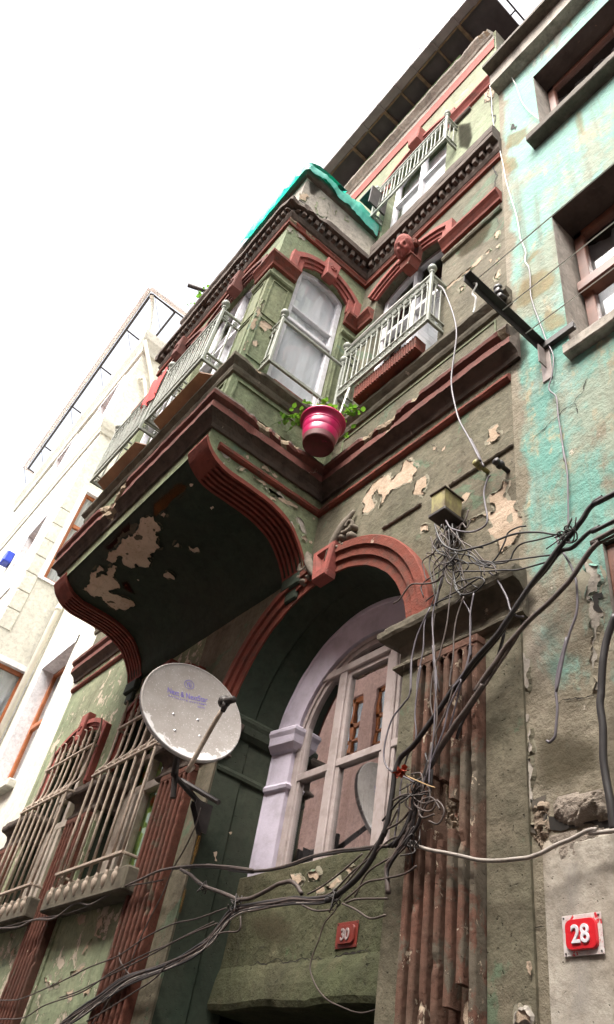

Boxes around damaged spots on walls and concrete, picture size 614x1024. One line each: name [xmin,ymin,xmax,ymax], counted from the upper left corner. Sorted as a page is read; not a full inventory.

peeling [484,423,503,445]
peeling [361,457,429,515]
peeling [467,478,525,555]
peeling [82,510,200,611]
peeling [577,559,607,694]
peeling [523,651,533,694]
spalling [526,714,609,850]
peeling [289,863,356,895]